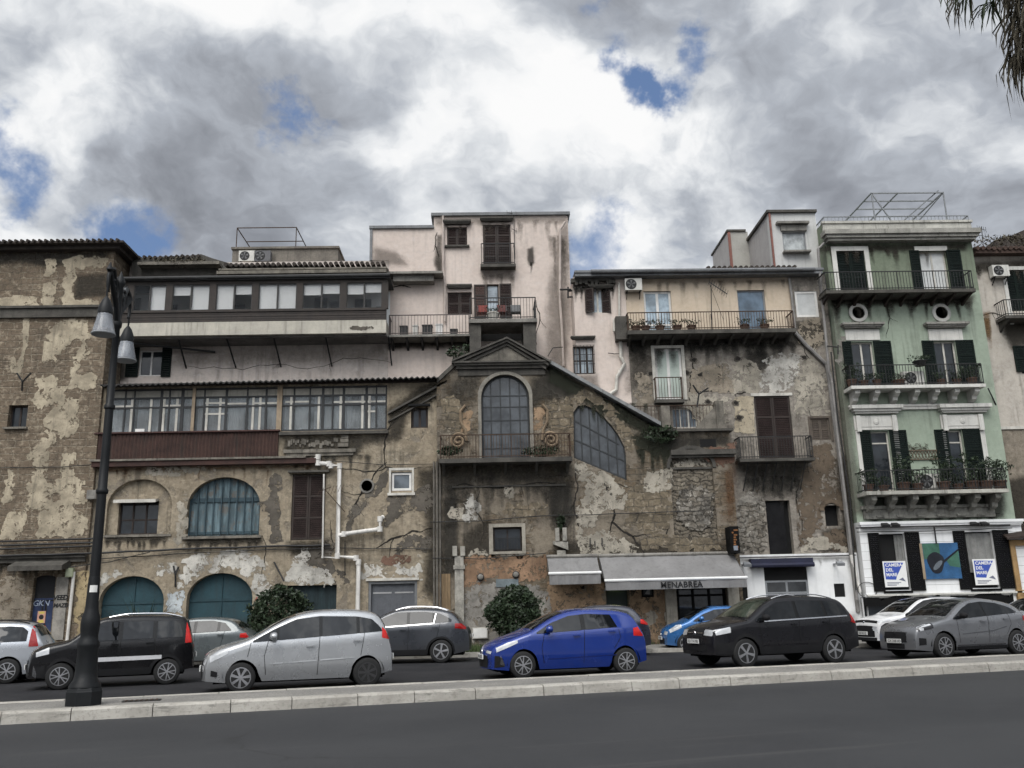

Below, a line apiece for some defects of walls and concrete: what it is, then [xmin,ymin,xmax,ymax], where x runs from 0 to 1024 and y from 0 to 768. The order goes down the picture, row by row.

flaking render [0,255,109,376]
spalling [574,318,830,559]
flaking render [154,498,272,614]
flaking render [285,534,433,587]
crack [324,426,422,583]
crack [376,528,433,556]
flaking render [447,494,481,521]
damp [419,466,573,596]
crack [467,469,668,553]